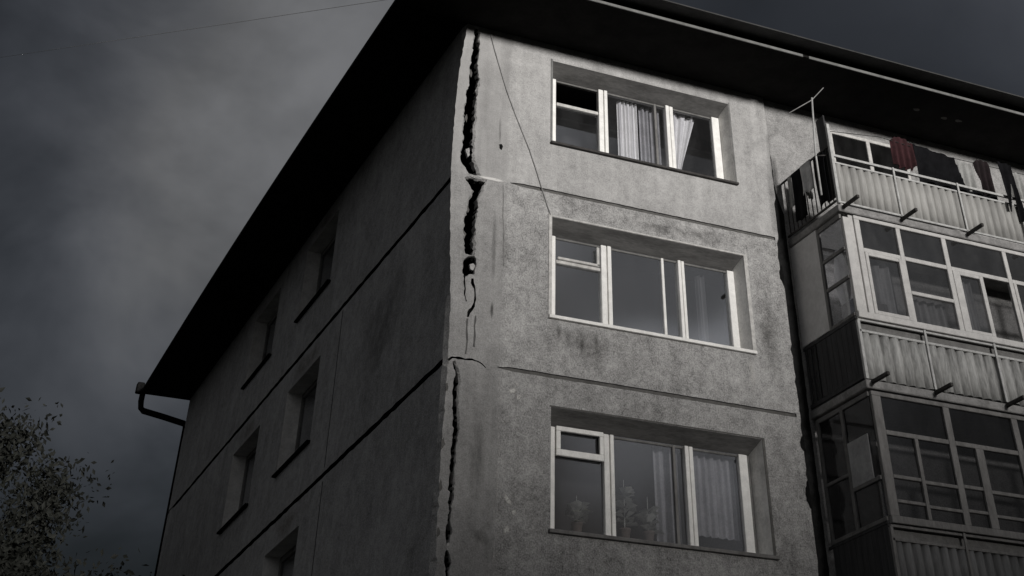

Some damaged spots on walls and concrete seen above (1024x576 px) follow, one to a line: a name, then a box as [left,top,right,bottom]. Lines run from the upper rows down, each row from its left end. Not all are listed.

crack [444,26,504,576]